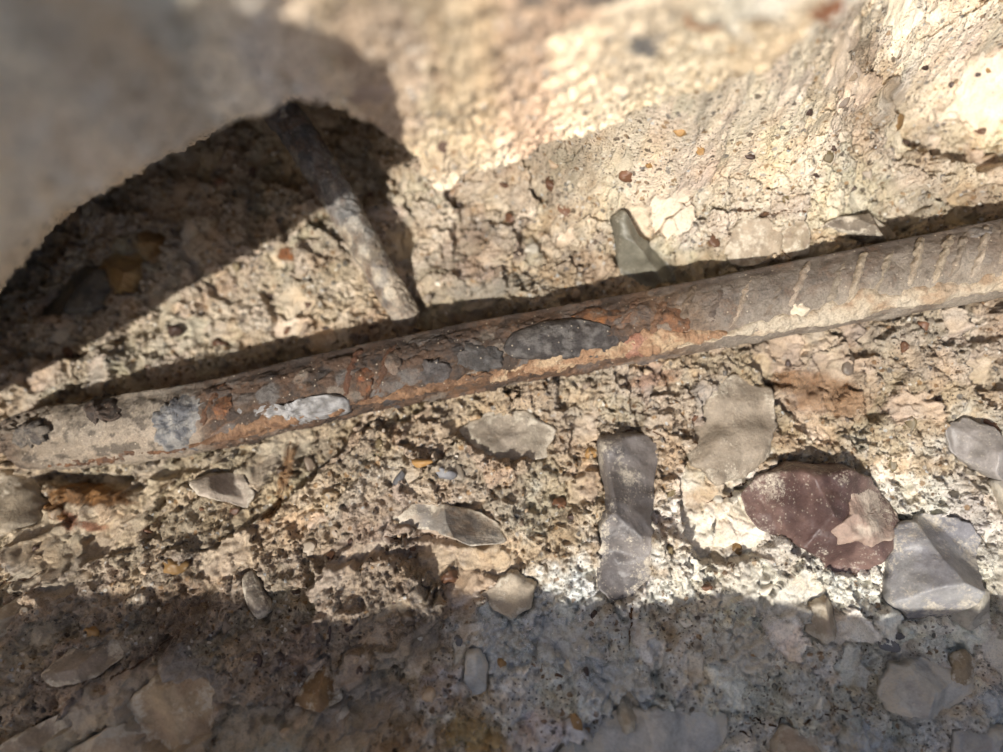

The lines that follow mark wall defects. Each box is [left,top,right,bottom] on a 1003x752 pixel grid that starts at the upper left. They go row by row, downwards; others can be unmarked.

spalling [894,10,1003,170]
spalling [0,0,863,308]
corrosion [277,247,294,261]
spalling [2,161,392,400]
corrosion [659,307,691,333]
corrosion [384,353,403,375]
corrosion [418,307,622,398]
corrosion [83,391,122,425]
corrosion [383,393,405,409]
corrosion [772,372,865,417]
corrosion [12,418,52,449]
corrosion [43,481,137,531]